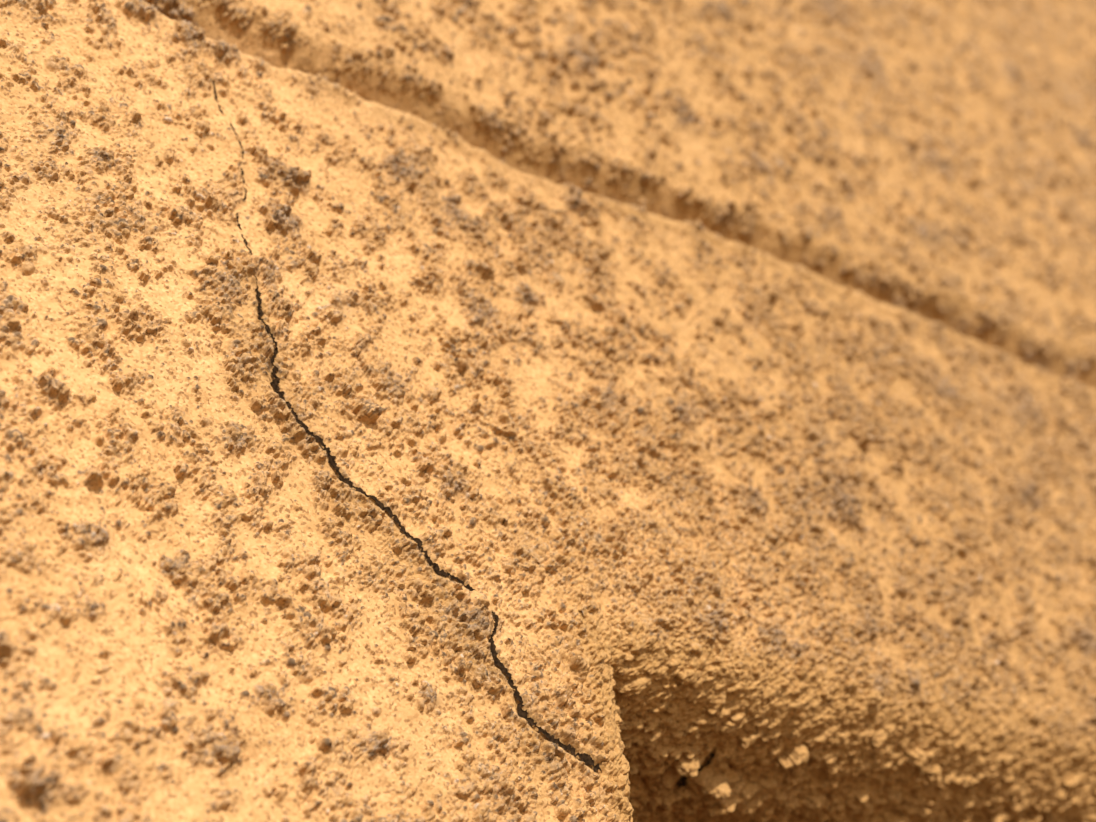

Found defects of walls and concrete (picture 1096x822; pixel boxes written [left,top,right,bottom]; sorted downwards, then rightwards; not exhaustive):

crack [212,81,475,591]
crack [488,611,602,773]